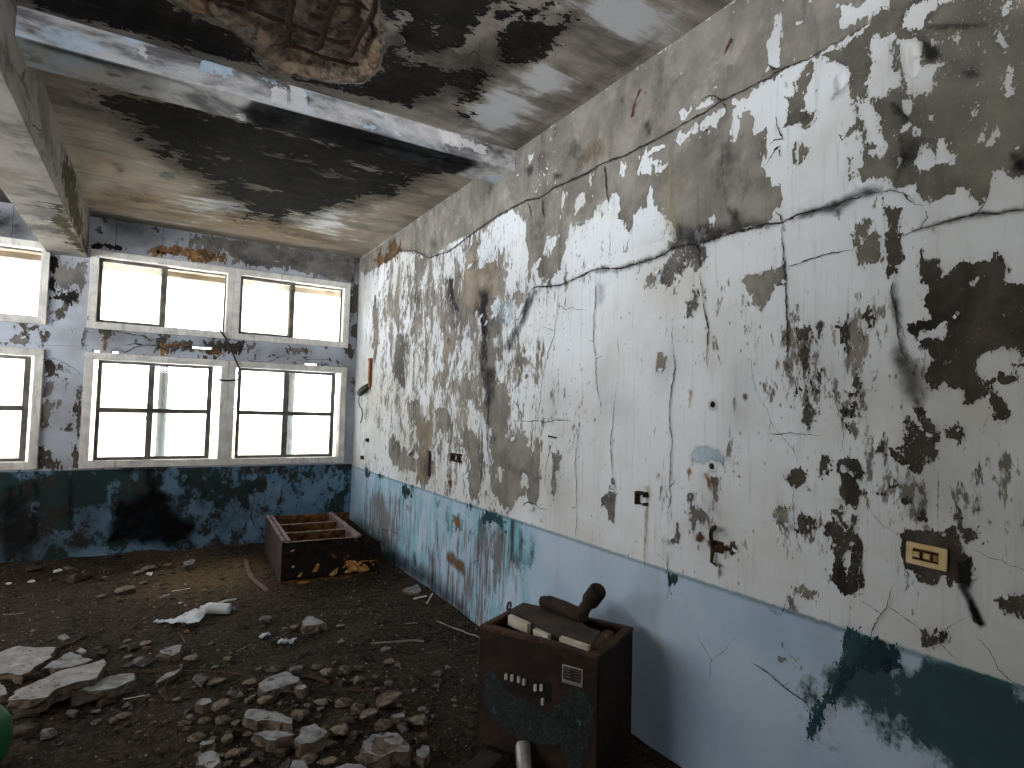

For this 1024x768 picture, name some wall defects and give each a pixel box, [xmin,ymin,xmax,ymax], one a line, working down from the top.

crack [365,2,910,275]
peeling [49,242,127,302]
peeling [146,0,1024,517]
damp [480,294,493,405]
peeling [35,359,82,471]
damp [108,471,196,543]
peeling [601,478,618,524]
peeling [664,476,719,547]
peeling [773,452,988,598]
peeling [920,626,951,650]
damp [958,559,985,627]
peeling [993,593,1024,619]